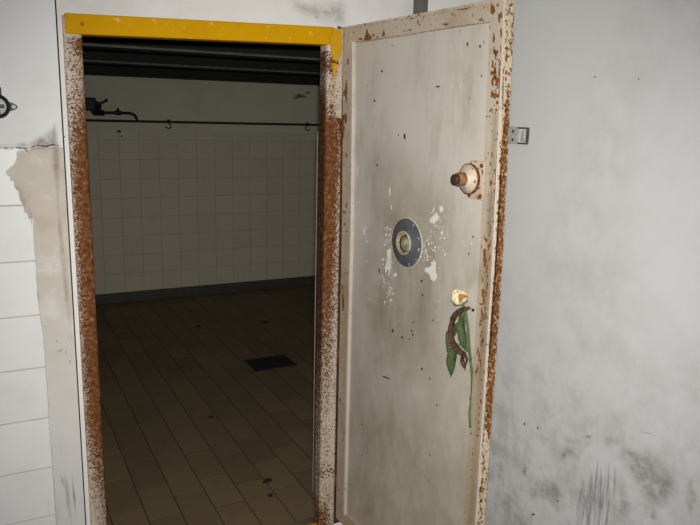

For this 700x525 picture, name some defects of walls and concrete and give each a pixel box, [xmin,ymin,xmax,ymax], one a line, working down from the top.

corrosion [64,37,107,525]
corrosion [314,51,349,525]
peeling [369,227,397,303]
corrosion [352,29,421,42]
peeling [418,202,457,282]
corrosion [468,3,514,522]